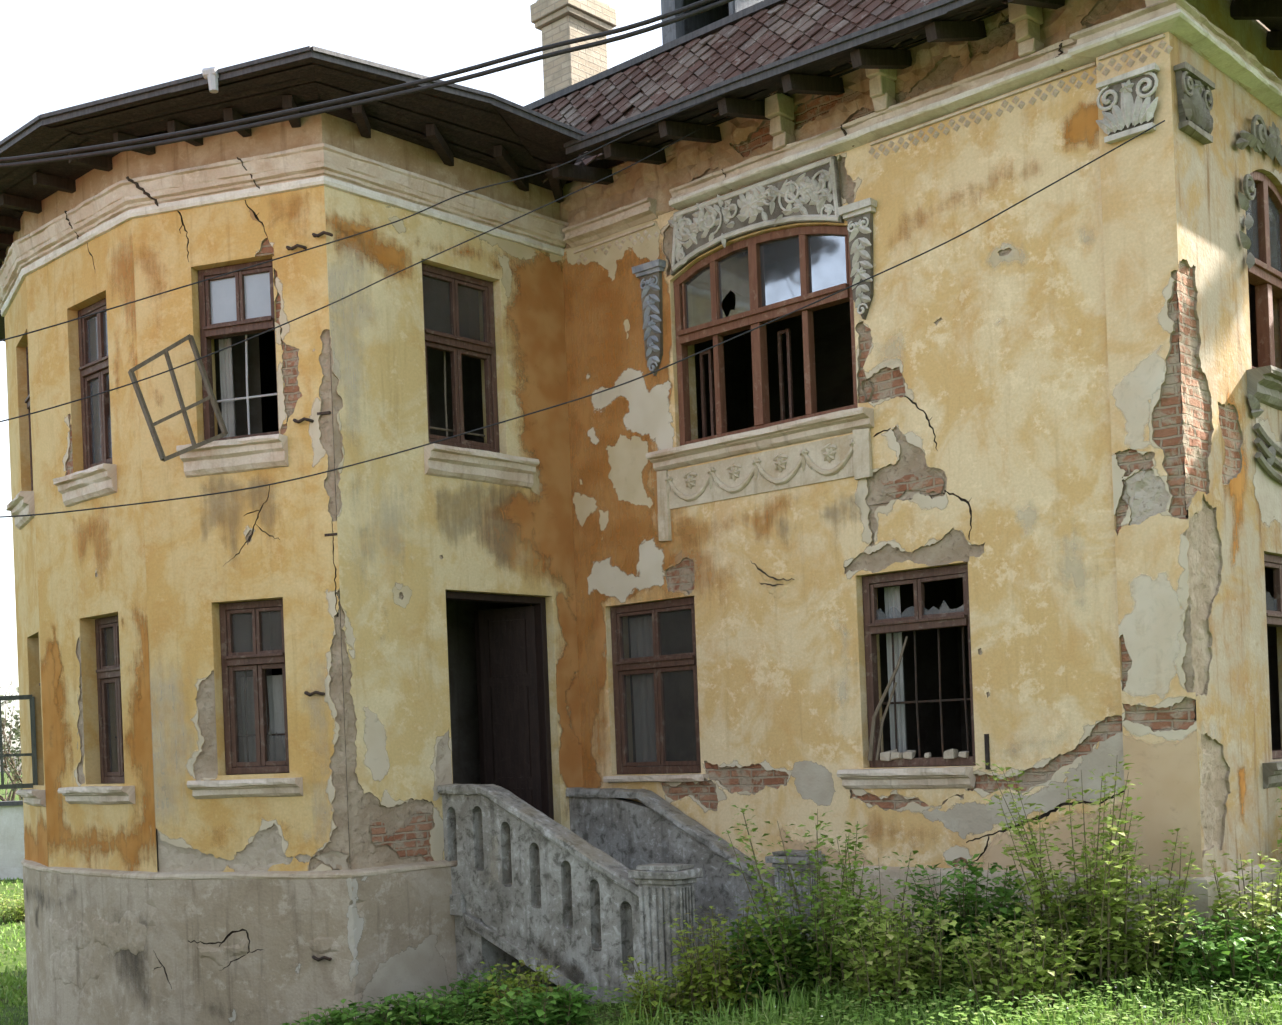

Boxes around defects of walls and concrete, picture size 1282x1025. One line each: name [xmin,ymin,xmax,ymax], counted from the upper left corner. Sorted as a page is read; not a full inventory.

crack [64,211,95,269]
crack [126,176,189,261]
crack [237,157,268,238]
flaking render [249,209,344,522]
peeling [573,368,674,539]
crack [225,485,280,564]
peeling [392,583,412,608]
peeling [587,538,697,603]
peeling [843,259,1282,869]
flaking render [157,590,452,982]
flaking render [661,760,792,812]
crack [188,929,263,971]